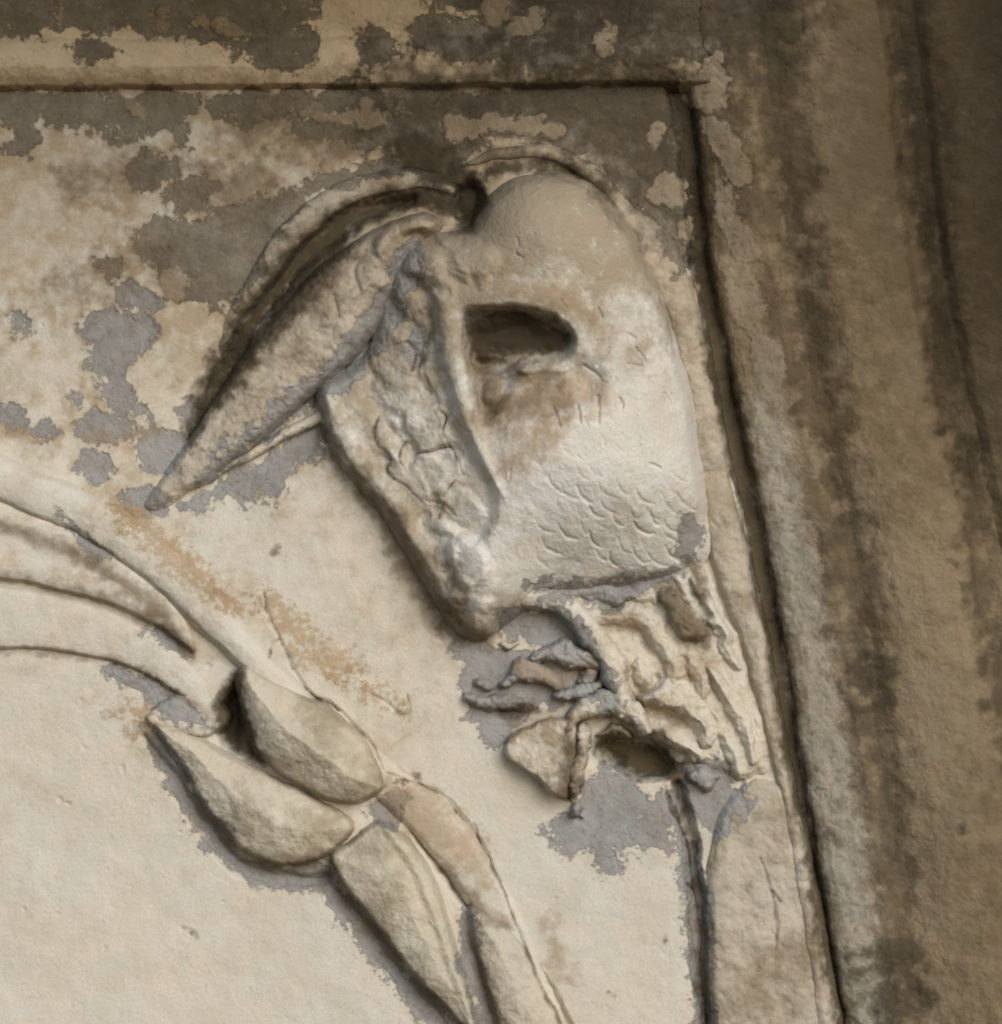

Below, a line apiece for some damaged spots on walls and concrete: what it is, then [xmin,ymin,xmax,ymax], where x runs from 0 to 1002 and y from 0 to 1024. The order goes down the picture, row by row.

peeling [0,0,322,77]
peeling [0,20,694,519]
water stain [893,0,951,224]
peeling [402,0,893,1024]
water stain [821,516,917,885]
water stain [957,456,1002,715]